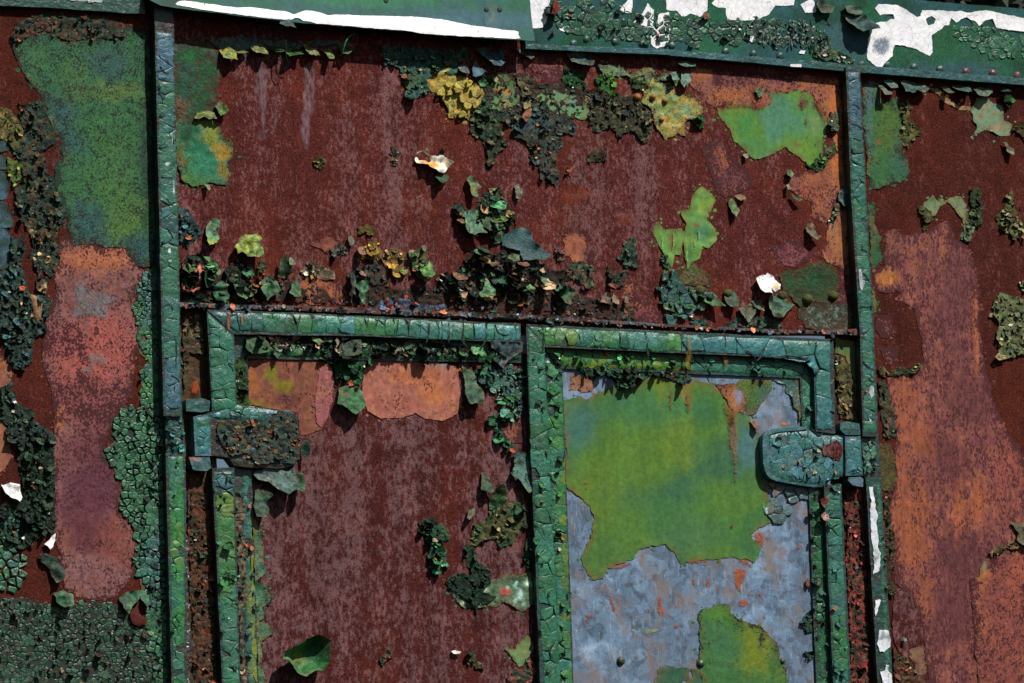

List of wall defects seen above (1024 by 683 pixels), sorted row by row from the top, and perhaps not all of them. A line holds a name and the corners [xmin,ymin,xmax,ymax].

peeling [165,0,841,195]
peeling [620,0,1024,67]
peeling [858,80,1024,313]
peeling [0,0,167,683]
crack [0,32,185,683]
crack [194,72,888,683]
peeling [168,175,926,683]
peeling [988,280,1024,361]
crack [884,648,892,678]
corrosion [891,588,924,658]